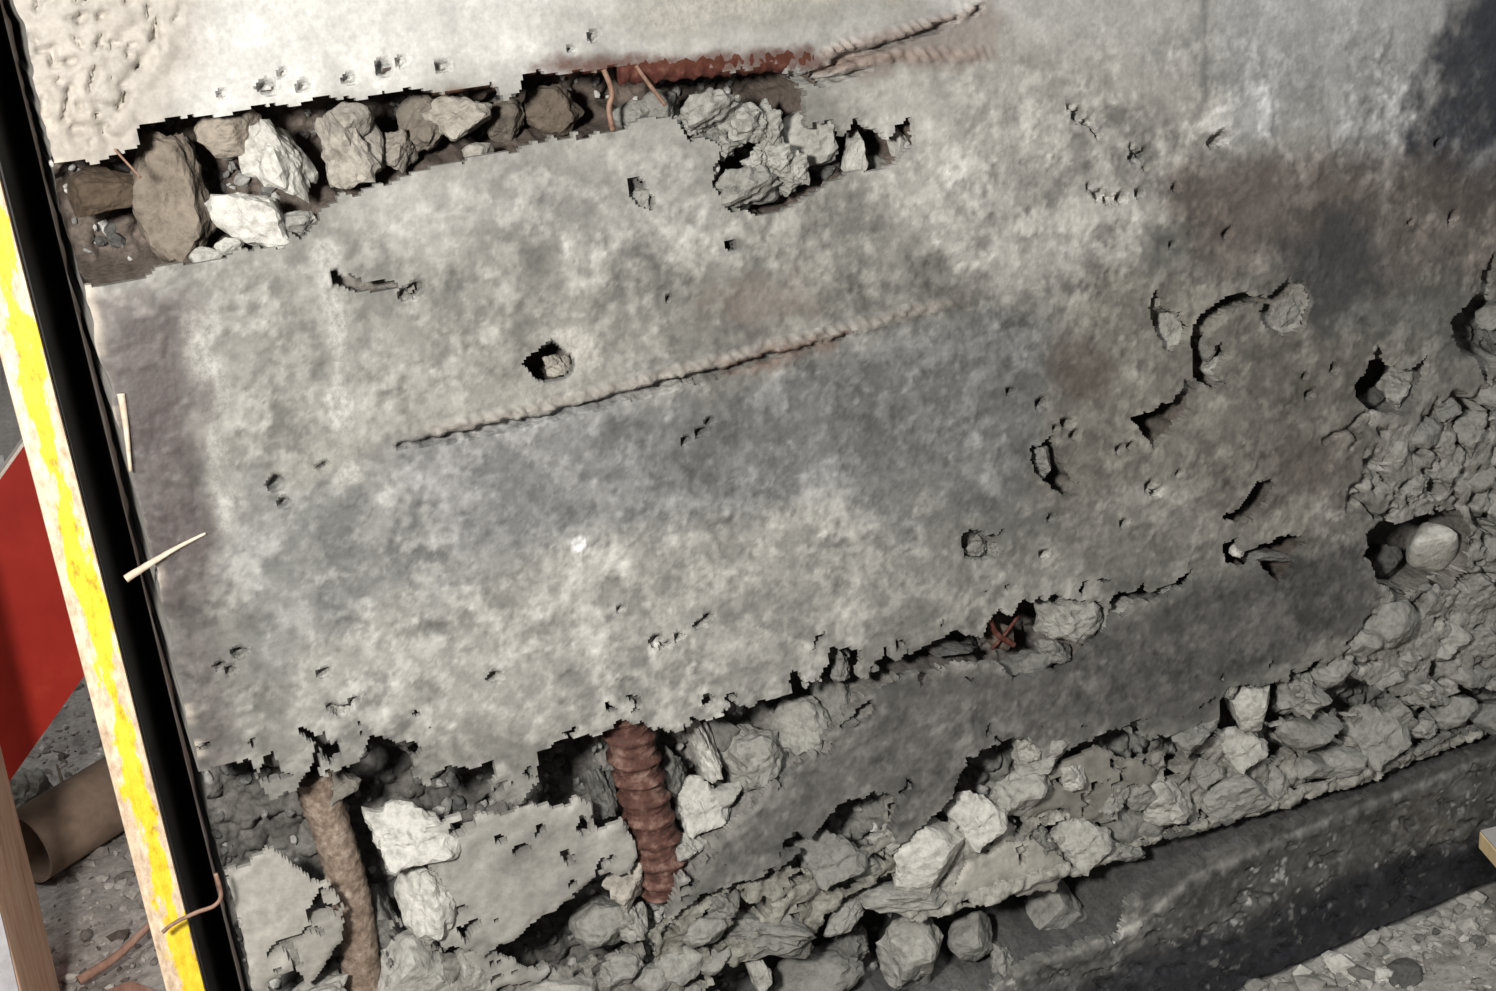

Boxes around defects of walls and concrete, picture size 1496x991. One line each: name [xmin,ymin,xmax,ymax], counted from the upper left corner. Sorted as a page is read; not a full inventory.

corrosion [559,49,817,71]
damp [1404,0,1496,166]
spalling [13,0,912,287]
spalling [1450,256,1496,396]
hole [1354,345,1424,414]
hole [1364,497,1473,603]
hole [211,643,254,677]
hole [315,663,335,679]
hole [485,668,506,684]
hole [648,610,717,652]
peeling [224,701,904,991]
peeling [898,698,1486,924]